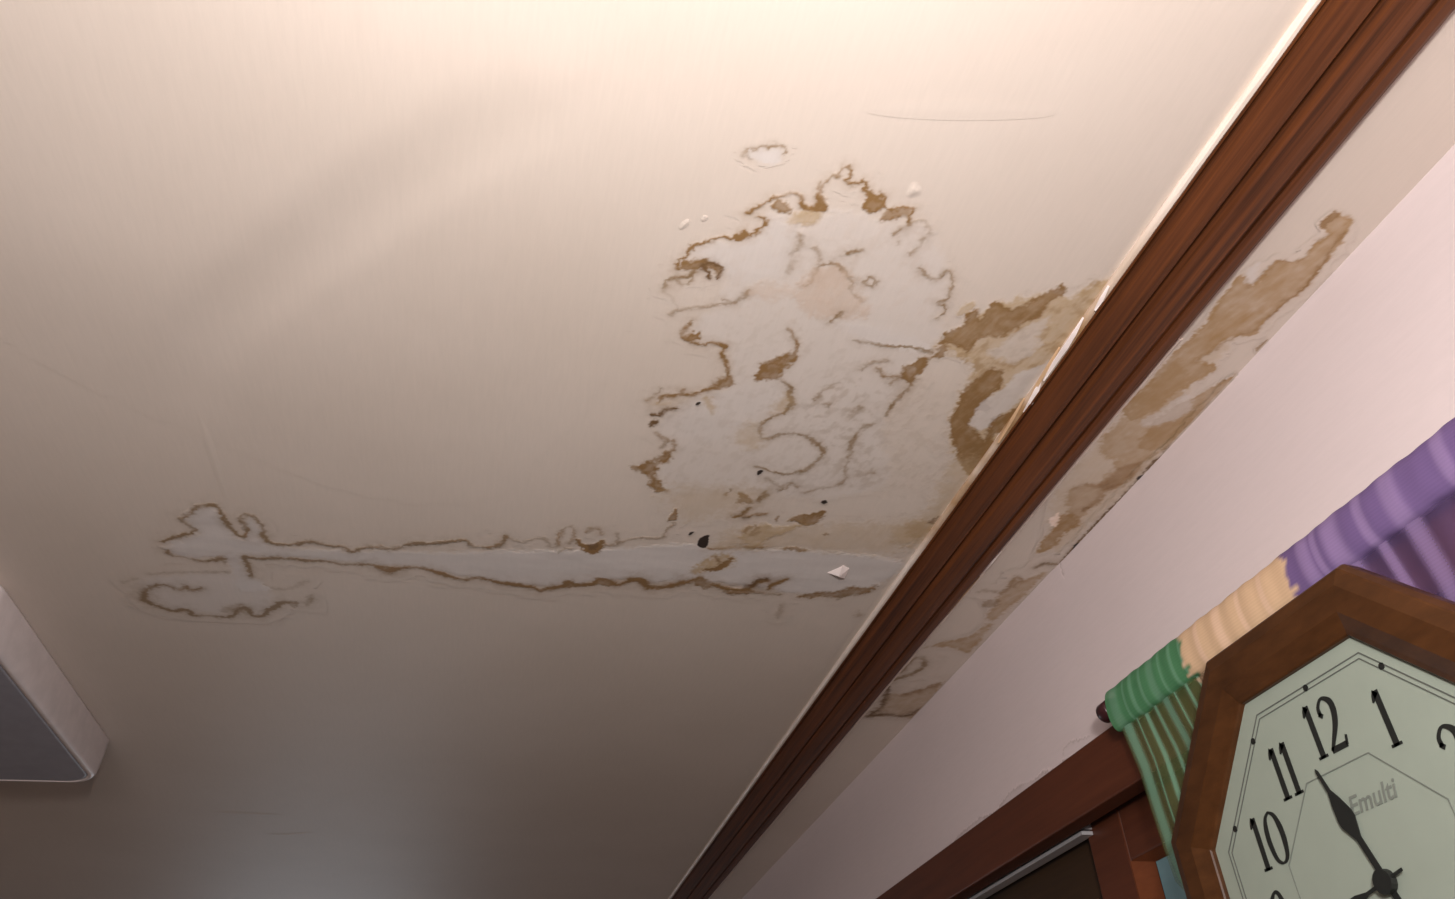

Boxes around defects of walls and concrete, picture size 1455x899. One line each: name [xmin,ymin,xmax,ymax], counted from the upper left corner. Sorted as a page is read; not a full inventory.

damp [107,134,1116,626]
damp [861,208,1360,722]